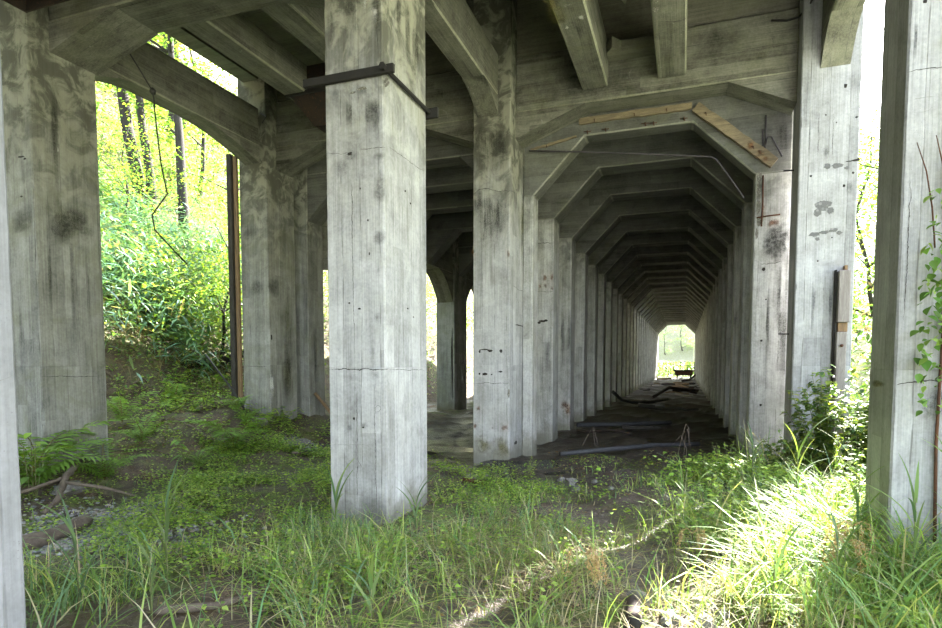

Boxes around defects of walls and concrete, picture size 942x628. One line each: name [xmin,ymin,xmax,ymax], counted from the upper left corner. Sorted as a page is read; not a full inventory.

rust [757,175,780,227]